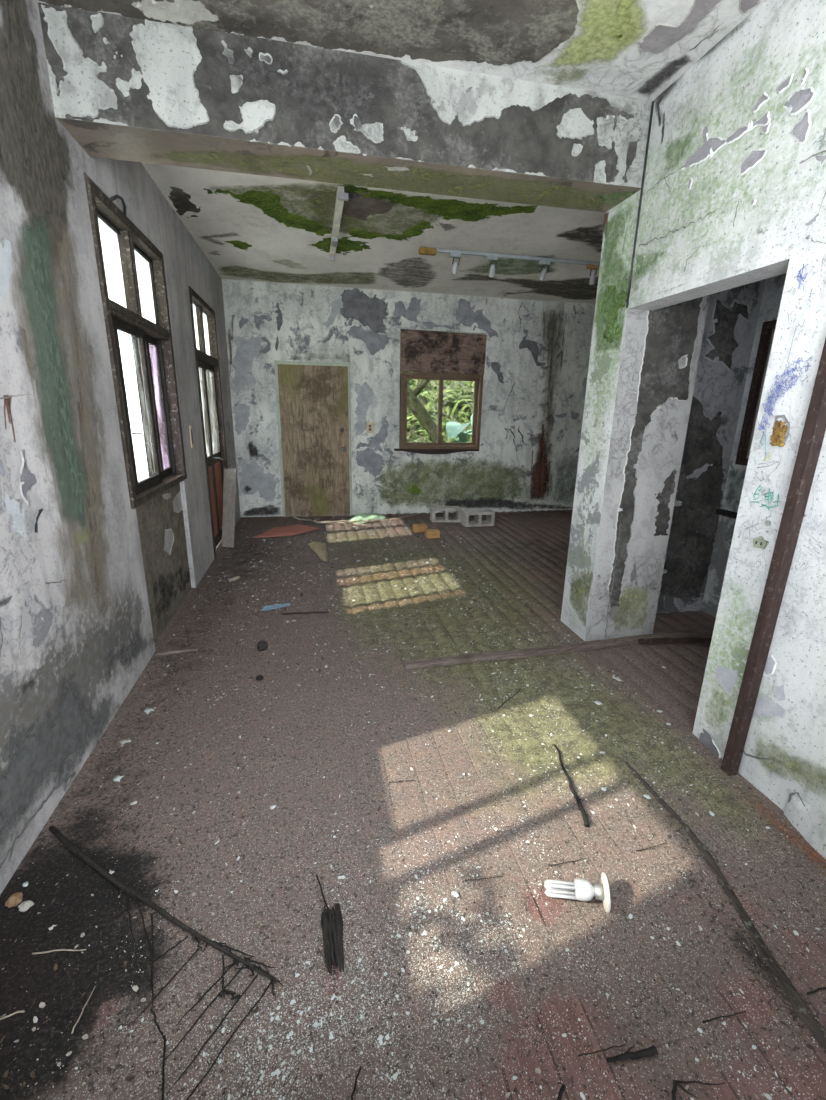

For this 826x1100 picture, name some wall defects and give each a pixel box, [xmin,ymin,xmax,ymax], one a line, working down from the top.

peeling [635,0,725,54]
peeling [738,0,760,15]
peeling [38,0,640,185]
leakage [638,57,690,140]
peeling [681,67,816,190]
leakage [0,0,603,618]
peeling [322,288,498,355]
peeling [232,303,283,435]
peeling [238,461,281,502]
peeling [354,382,388,476]
peeling [607,297,749,607]
leakage [110,633,154,665]